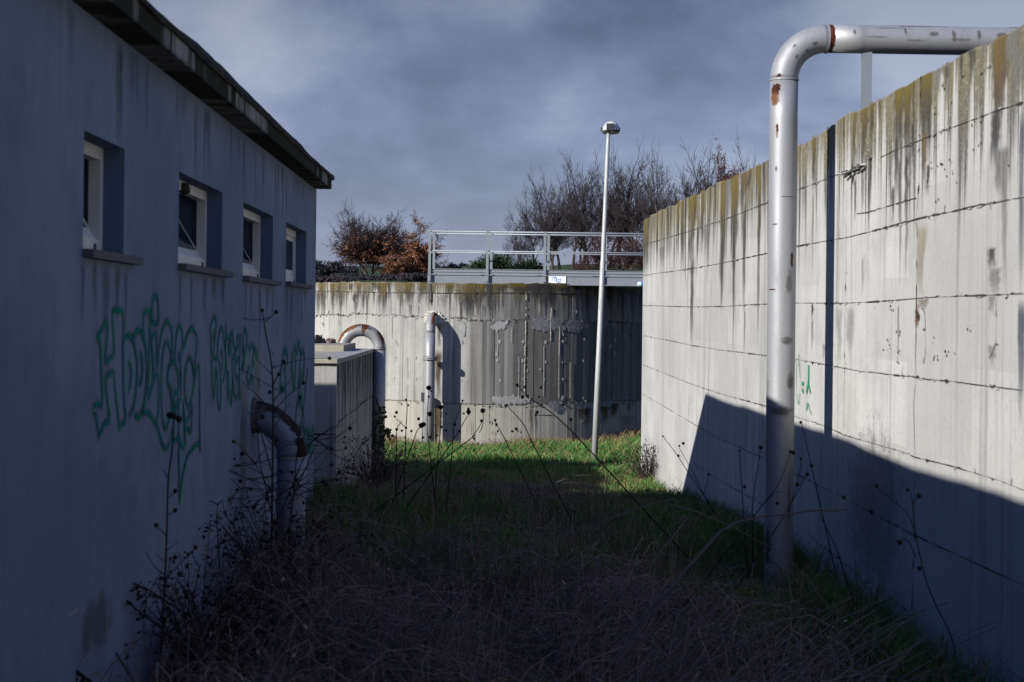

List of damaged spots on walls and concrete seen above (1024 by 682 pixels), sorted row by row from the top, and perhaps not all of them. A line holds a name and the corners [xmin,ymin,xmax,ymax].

water stain [991,28,1020,169]
water stain [839,98,880,163]
water stain [854,160,871,208]
water stain [891,48,975,269]
water stain [644,162,768,333]
water stain [316,283,389,308]
water stain [464,283,590,315]
water stain [609,286,643,312]
corrosion [338,324,385,350]
corrosion [254,401,307,457]